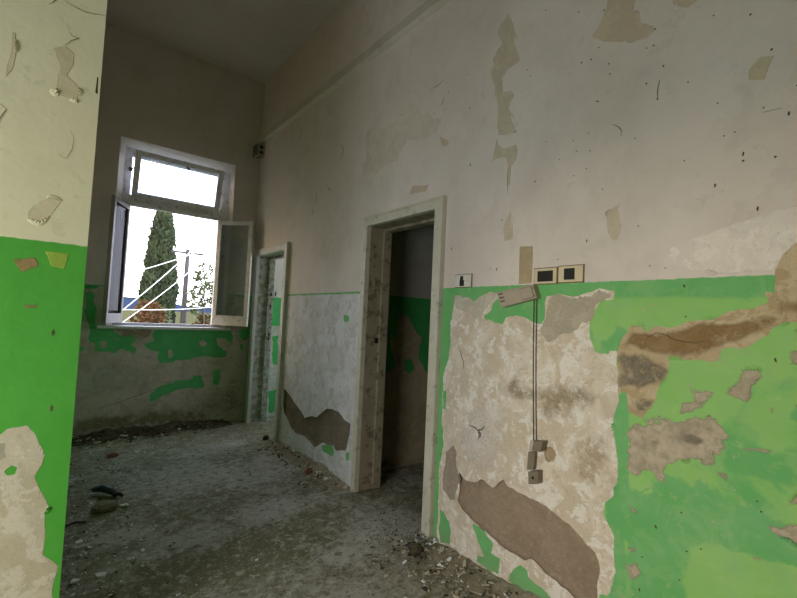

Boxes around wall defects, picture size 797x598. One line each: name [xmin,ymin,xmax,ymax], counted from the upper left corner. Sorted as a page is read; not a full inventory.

peeling [49,46,84,103]
peeling [490,13,520,186]
peeling [593,0,656,49]
peeling [27,194,62,226]
peeling [72,286,251,444]
peeling [266,293,360,487]
peeling [437,204,797,598]
peeling [0,426,58,598]